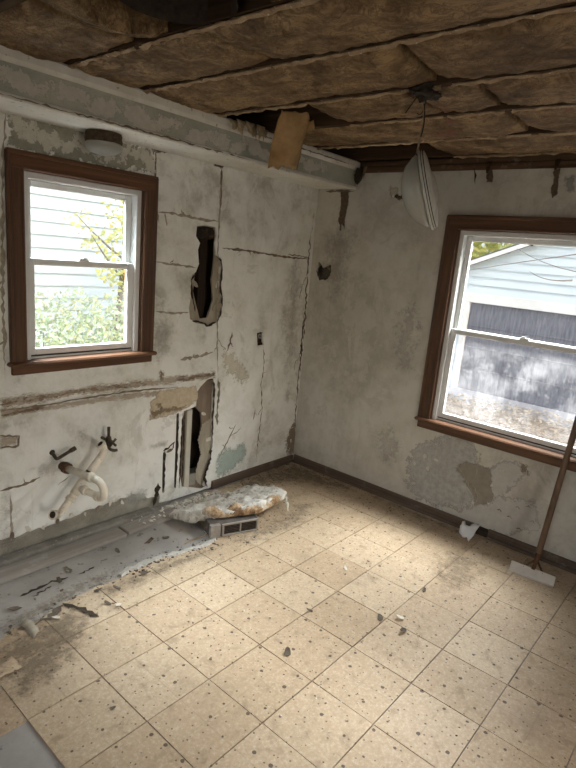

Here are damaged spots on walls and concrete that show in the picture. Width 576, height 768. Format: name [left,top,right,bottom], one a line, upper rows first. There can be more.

peeling [3,113,157,176]
crack [0,93,314,457]
spalling [189,225,223,327]
spalling [317,262,331,281]
spalling [150,379,215,506]
spalling [403,434,540,535]